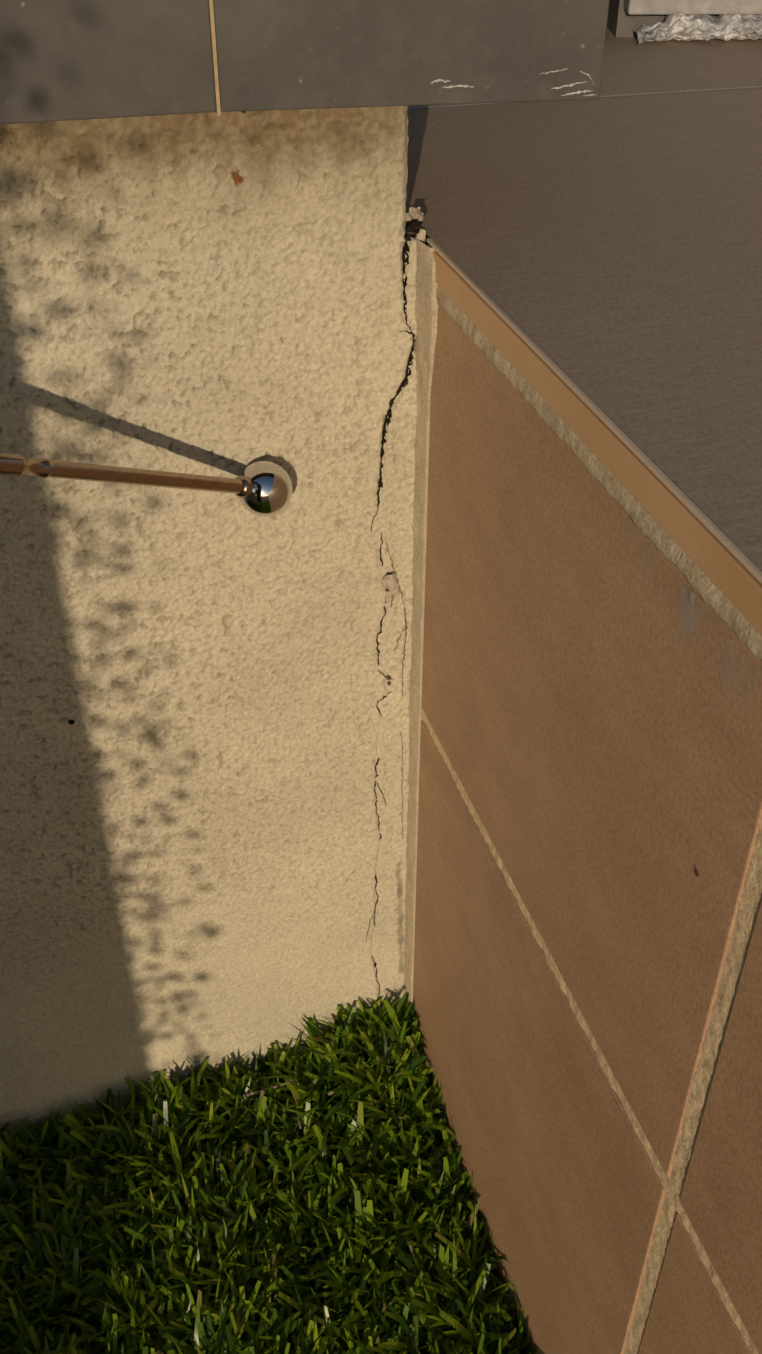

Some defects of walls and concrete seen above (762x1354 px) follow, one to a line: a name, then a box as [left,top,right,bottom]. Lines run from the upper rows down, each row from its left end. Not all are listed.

crack [370,221,422,841]
crack [365,874,380,1009]